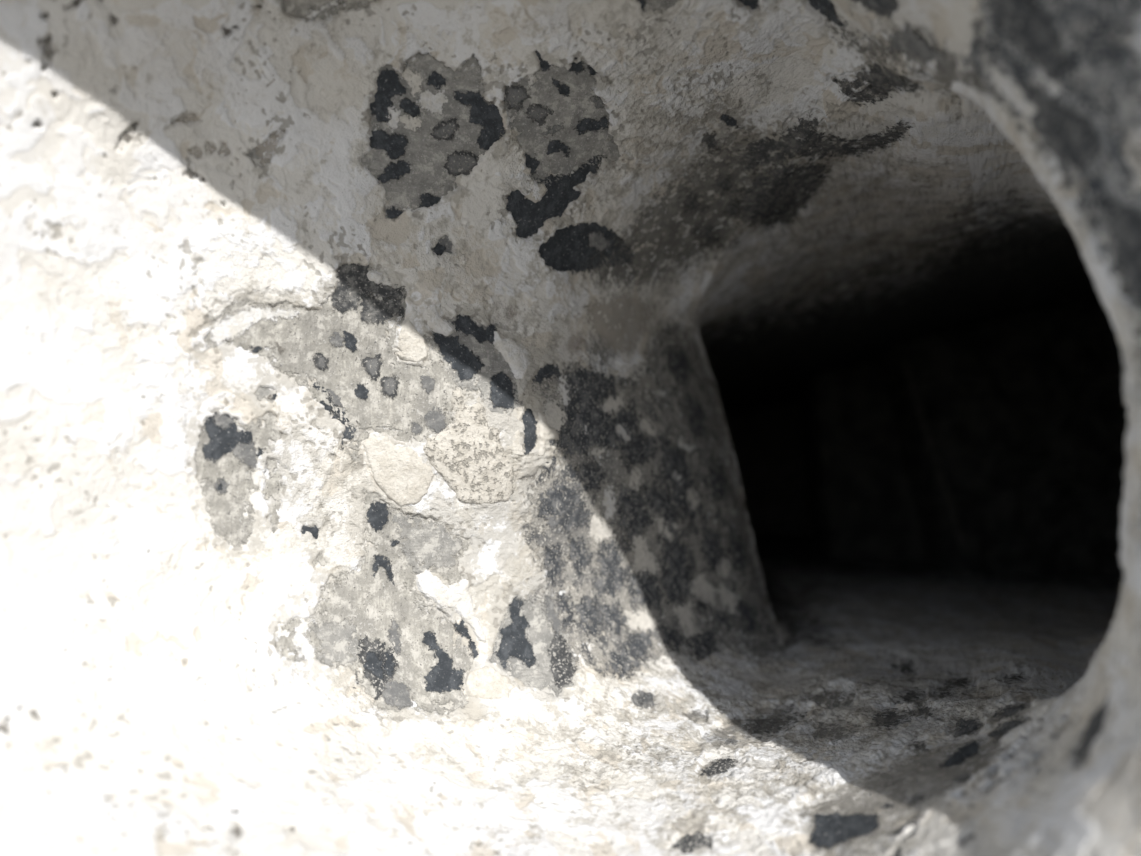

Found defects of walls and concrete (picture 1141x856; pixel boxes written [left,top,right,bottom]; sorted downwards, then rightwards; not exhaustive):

peeling [282,0,376,20]
peeling [195,263,797,715]
water stain [701,691,856,777]
water stain [810,659,977,740]
water stain [953,703,1044,749]